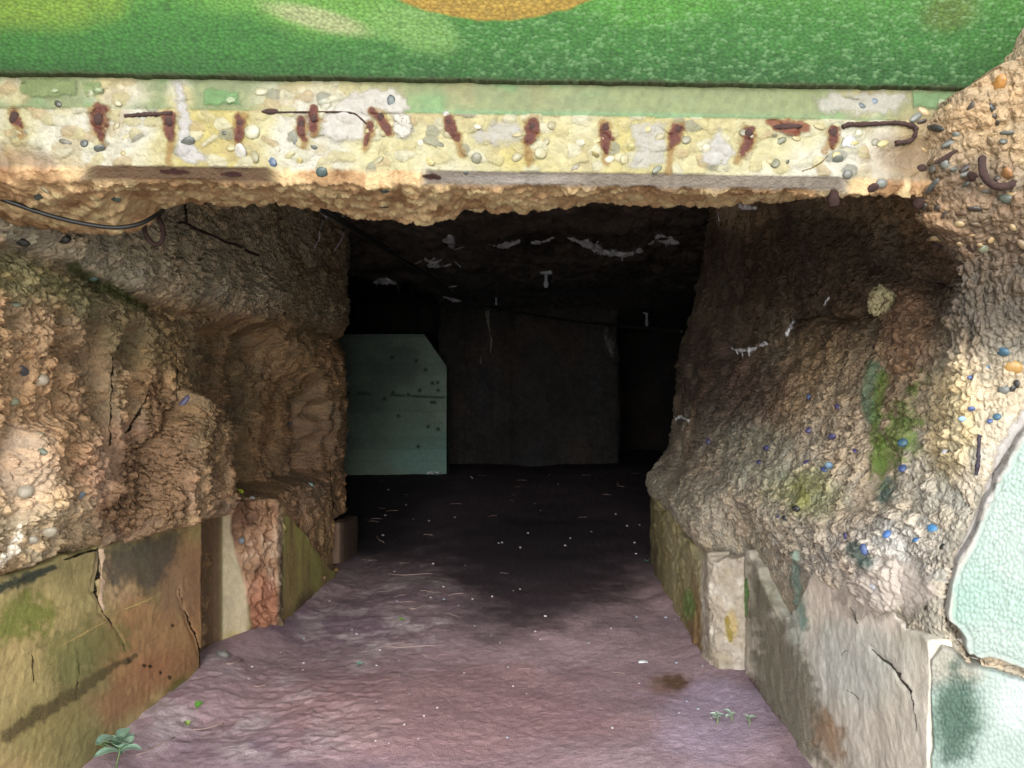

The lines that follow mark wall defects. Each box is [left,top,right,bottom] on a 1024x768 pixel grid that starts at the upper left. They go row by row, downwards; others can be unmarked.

corrosion [89,102,109,147]
corrosion [295,104,321,149]
corrosion [363,107,394,150]
corrosion [523,117,540,166]
corrosion [734,118,810,164]
efflorescence [489,237,554,249]
efflorescence [568,234,679,261]
leakage [870,372,893,504]
leakage [846,541,872,570]
crack [64,548,126,651]
crack [178,589,201,668]
crack [872,649,917,729]